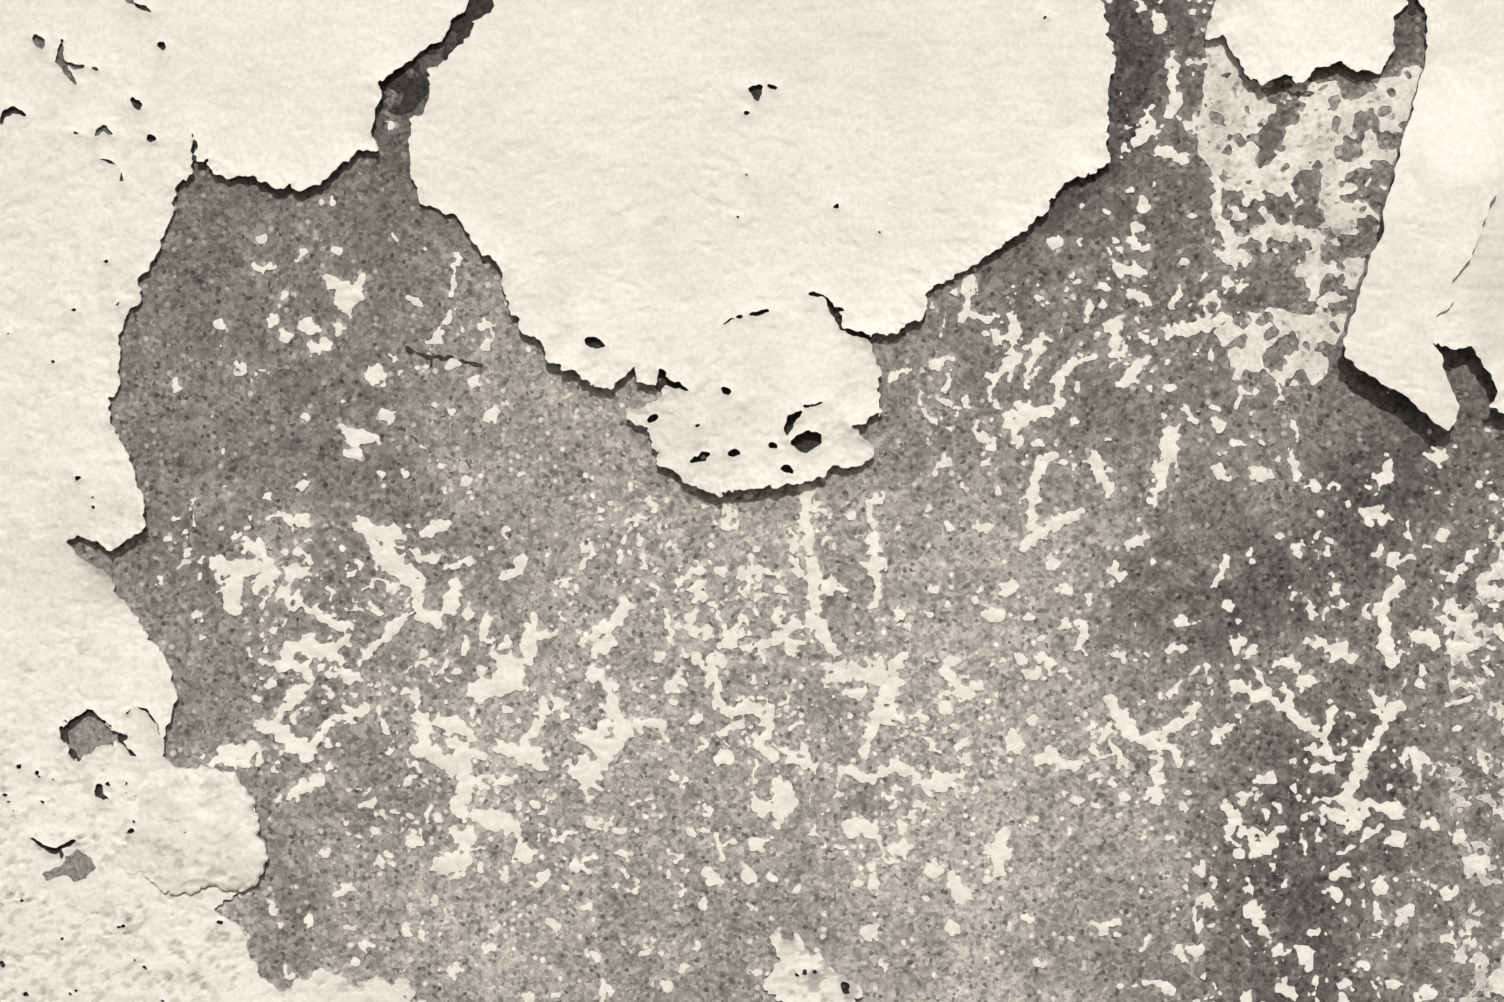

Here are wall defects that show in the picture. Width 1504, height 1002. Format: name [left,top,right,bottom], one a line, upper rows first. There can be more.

crack [379,0,494,114]
peeling [0,0,469,1002]
peeling [163,492,670,888]
peeling [364,252,496,388]